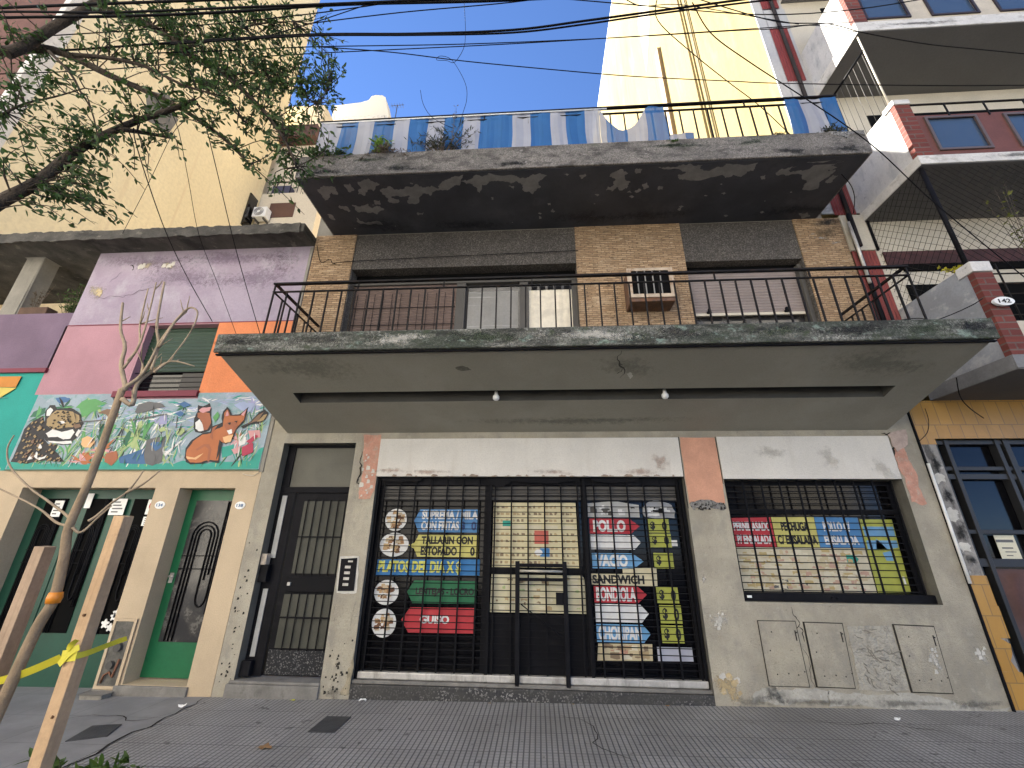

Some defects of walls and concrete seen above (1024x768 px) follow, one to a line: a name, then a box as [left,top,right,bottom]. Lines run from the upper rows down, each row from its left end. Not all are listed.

peeling [318,173,547,229]
peeling [594,169,663,204]
peeling [659,159,844,195]
peeling [131,262,175,270]
peeling [358,435,381,499]
peeling [883,429,927,505]